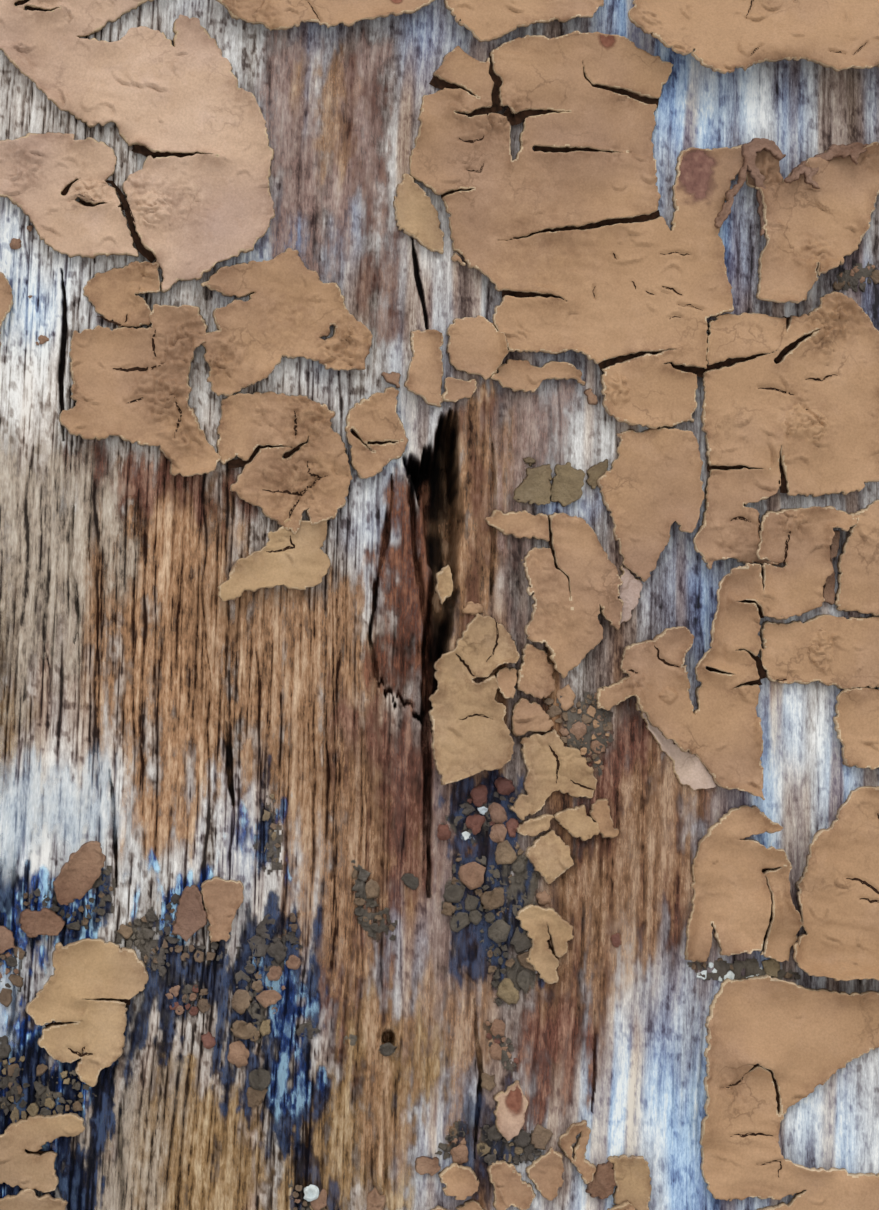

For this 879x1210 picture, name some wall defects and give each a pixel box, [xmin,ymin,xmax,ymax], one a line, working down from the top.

crack [16,0,48,12]
peeling [444,0,604,42]
peeling [628,0,879,74]
crack [429,53,612,199]
crack [592,85,659,108]
peeling [0,0,435,602]
crack [598,316,838,410]
crack [549,529,569,582]
peeling [393,31,879,1007]
peeling [0,841,304,1210]
peeling [415,1019,652,1210]
crack [726,1065,782,1177]